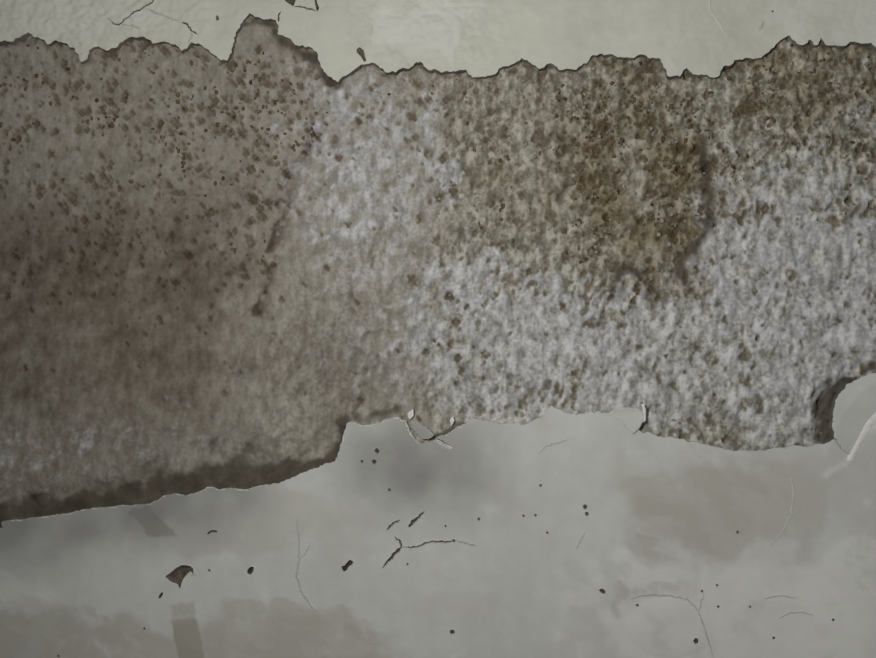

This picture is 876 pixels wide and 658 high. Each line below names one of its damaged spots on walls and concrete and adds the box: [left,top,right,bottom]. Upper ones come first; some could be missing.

flaking render [84,98,119,136]
flaking render [151,47,328,178]
flaking render [553,47,876,269]
damp [0,16,400,658]
peeling [595,404,646,434]
peeling [820,373,876,462]
crack [381,510,478,569]